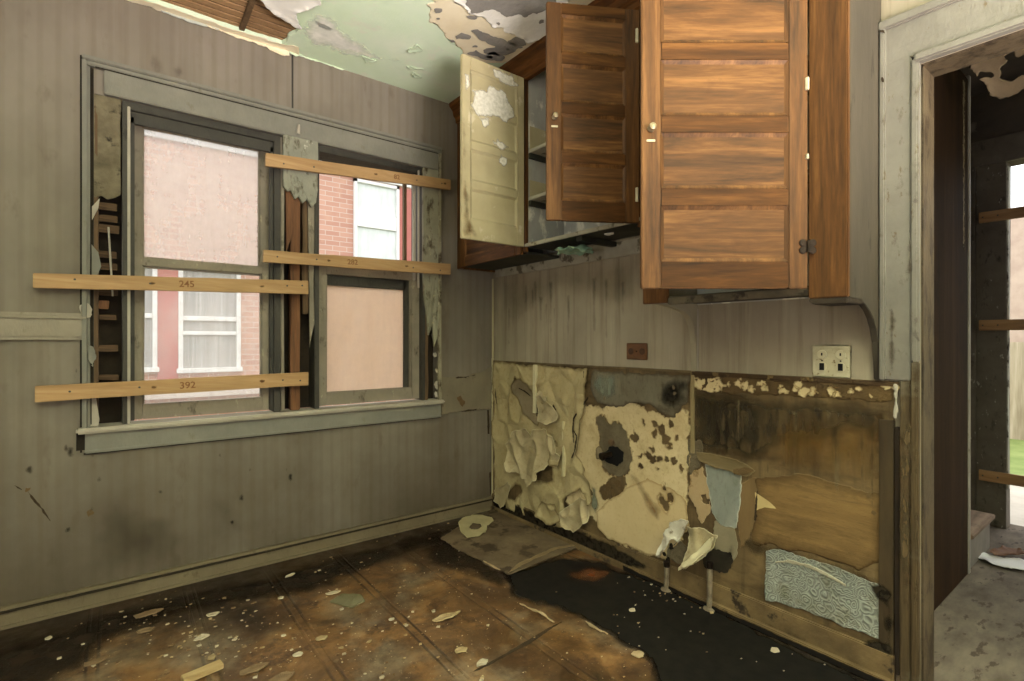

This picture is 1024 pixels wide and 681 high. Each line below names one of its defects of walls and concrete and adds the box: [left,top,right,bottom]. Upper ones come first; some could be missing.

peeling [127,0,345,70]
peeling [307,16,377,64]
peeling [426,0,594,63]
flaking render [970,49,1024,99]
spalling [91,94,122,275]
spalling [79,290,122,383]
spalling [90,397,122,426]
damp [695,395,880,459]
flaking render [565,369,900,573]
damp [0,498,884,681]